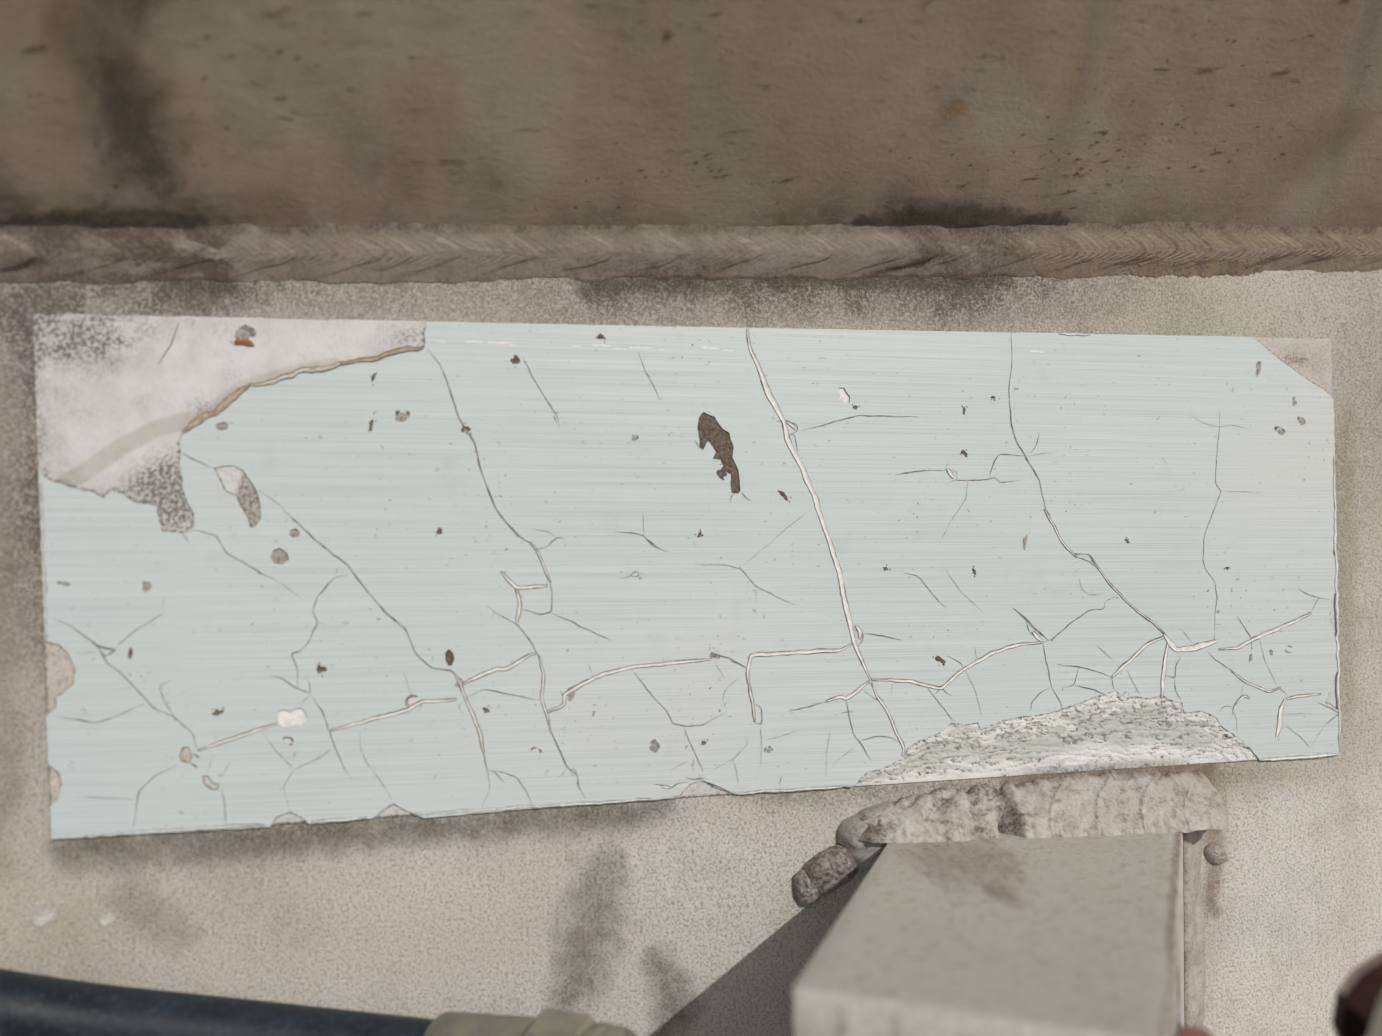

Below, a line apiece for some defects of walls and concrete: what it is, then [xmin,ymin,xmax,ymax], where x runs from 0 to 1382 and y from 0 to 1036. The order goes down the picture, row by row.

peeling [33,313,429,533]
crack [56,328,1339,827]
peeling [854,691,1259,786]